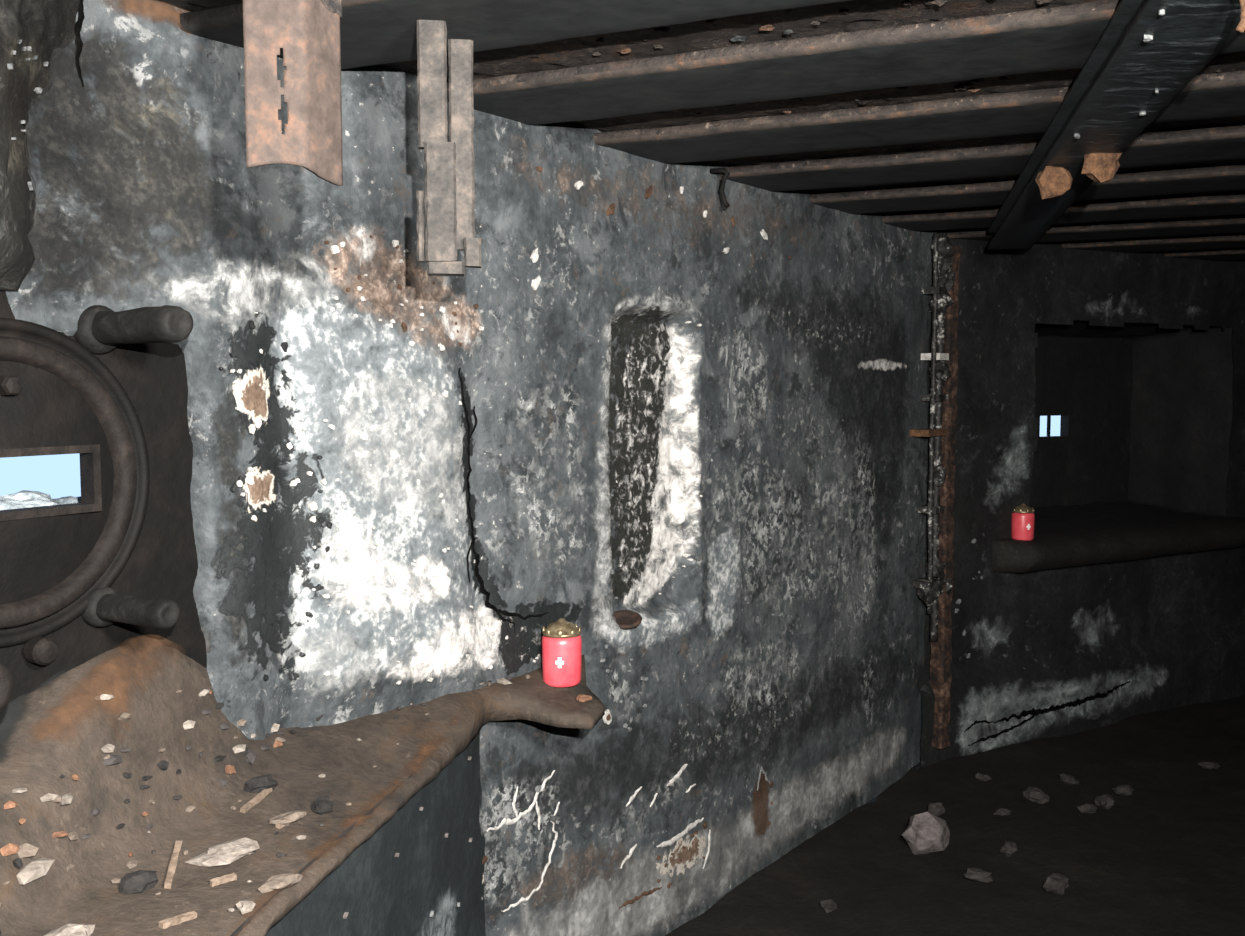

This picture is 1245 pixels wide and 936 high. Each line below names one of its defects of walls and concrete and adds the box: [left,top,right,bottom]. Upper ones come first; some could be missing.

damp [357,229,374,258]
peeling [219,232,500,687]
crack [458,368,549,629]
crack [964,681,1131,746]
damp [510,730,905,936]